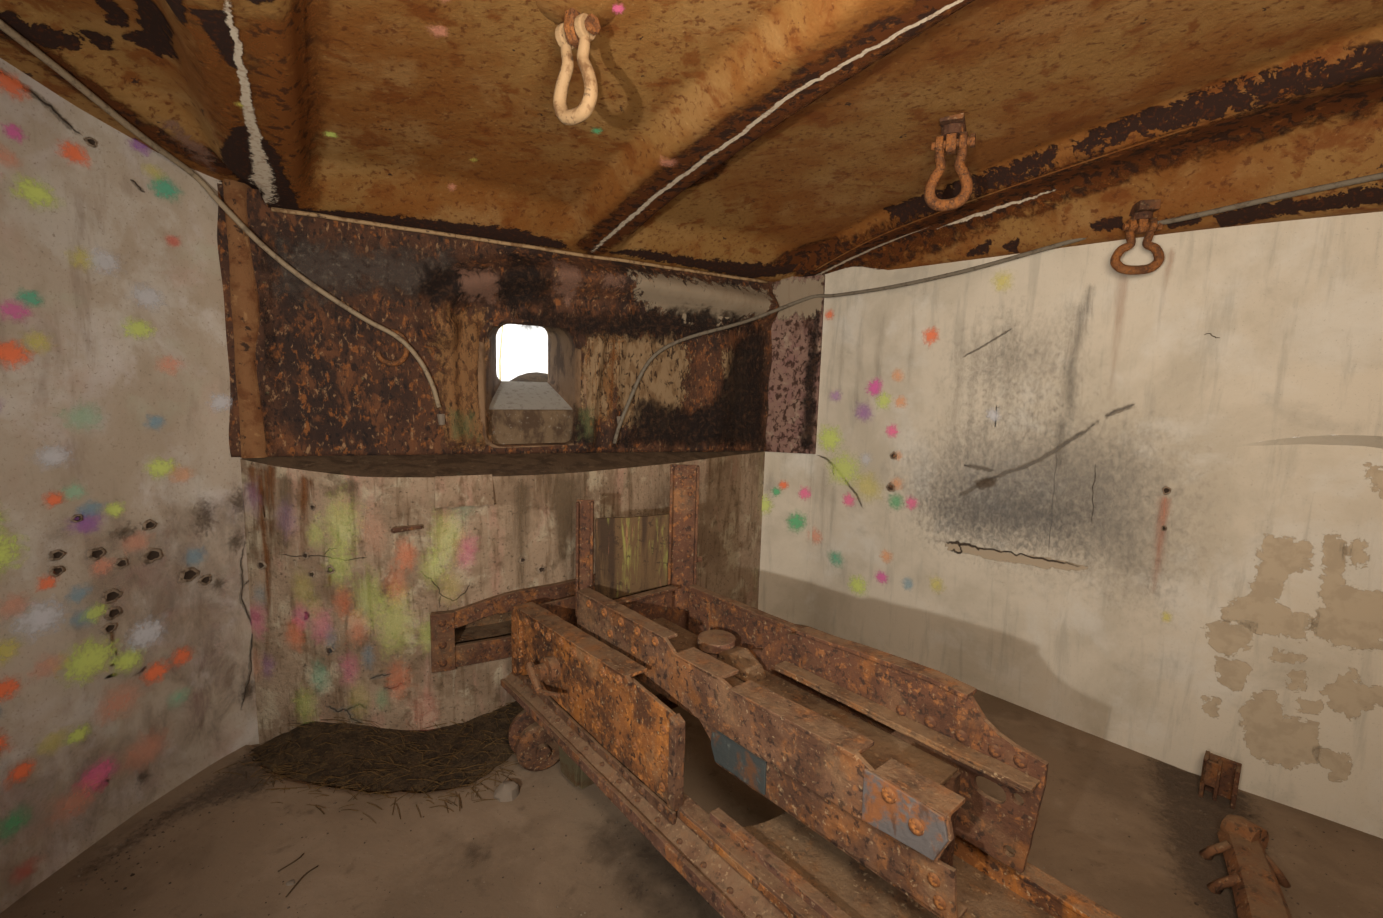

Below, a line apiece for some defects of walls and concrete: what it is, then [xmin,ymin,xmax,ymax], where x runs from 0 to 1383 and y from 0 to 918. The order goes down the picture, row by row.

peeling [1363,462,1383,499]
peeling [1201,531,1383,782]